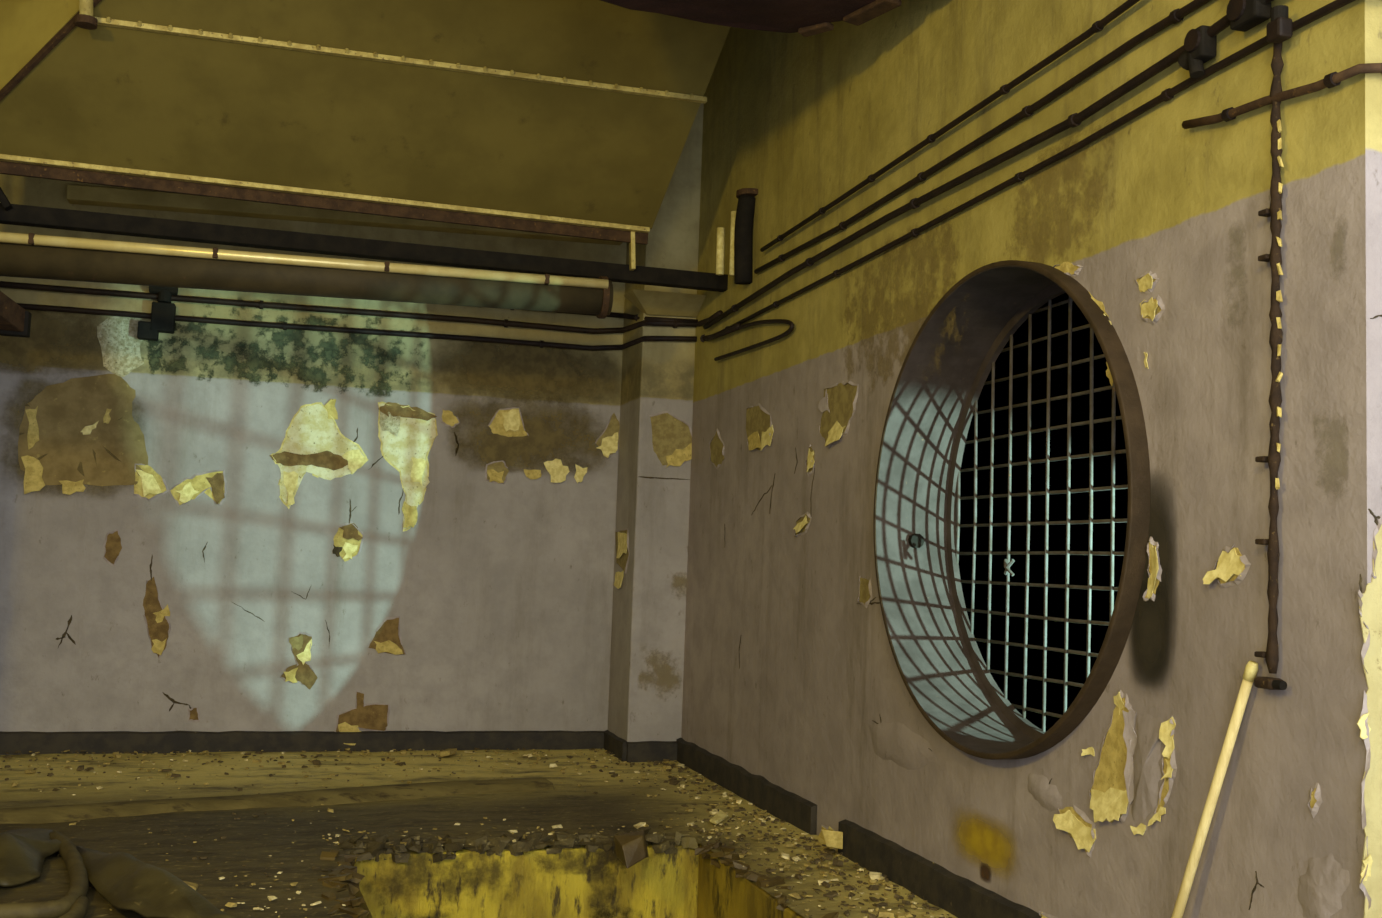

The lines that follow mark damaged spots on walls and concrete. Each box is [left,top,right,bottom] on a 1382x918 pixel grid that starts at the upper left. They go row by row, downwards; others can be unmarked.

damp [144,299,423,396]
peeling [18,316,227,507]
peeling [269,399,460,531]
peeling [488,407,529,437]
peeling [485,459,587,484]
peeling [595,413,620,460]
peeling [805,380,859,476]
peeling [1143,536,1162,601]
peeling [1202,544,1251,588]
peeling [279,632,318,689]
peeling [1357,515,1382,918]
peeling [1053,690,1177,857]